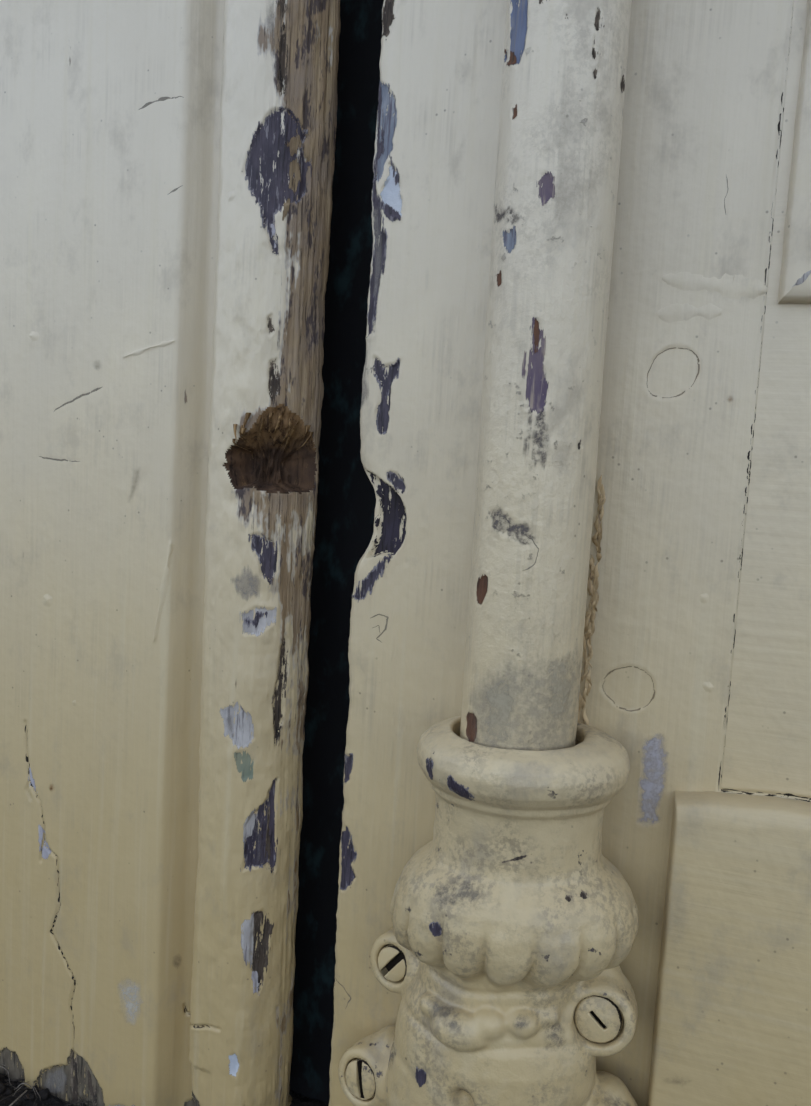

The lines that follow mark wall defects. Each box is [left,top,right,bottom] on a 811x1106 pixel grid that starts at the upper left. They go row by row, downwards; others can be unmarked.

peeling [245,107,313,254]
peeling [366,82,402,338]
peeling [522,317,549,464]
peeling [387,471,406,494]
peeling [236,534,277,595]
peeling [240,607,277,636]
peeling [353,553,395,602]
crack [25,726,76,1010]
peeling [240,778,278,873]
peeling [241,911,274,994]